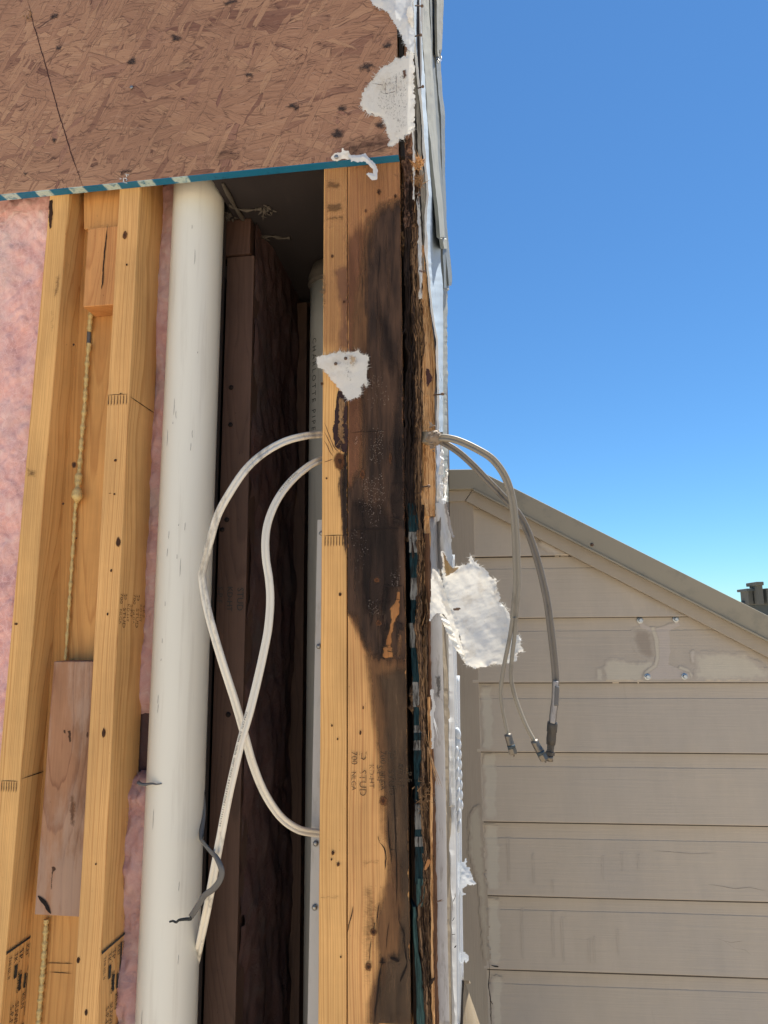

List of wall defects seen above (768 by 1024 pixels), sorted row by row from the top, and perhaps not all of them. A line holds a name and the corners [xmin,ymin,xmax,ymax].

leakage [336,162,413,1024]